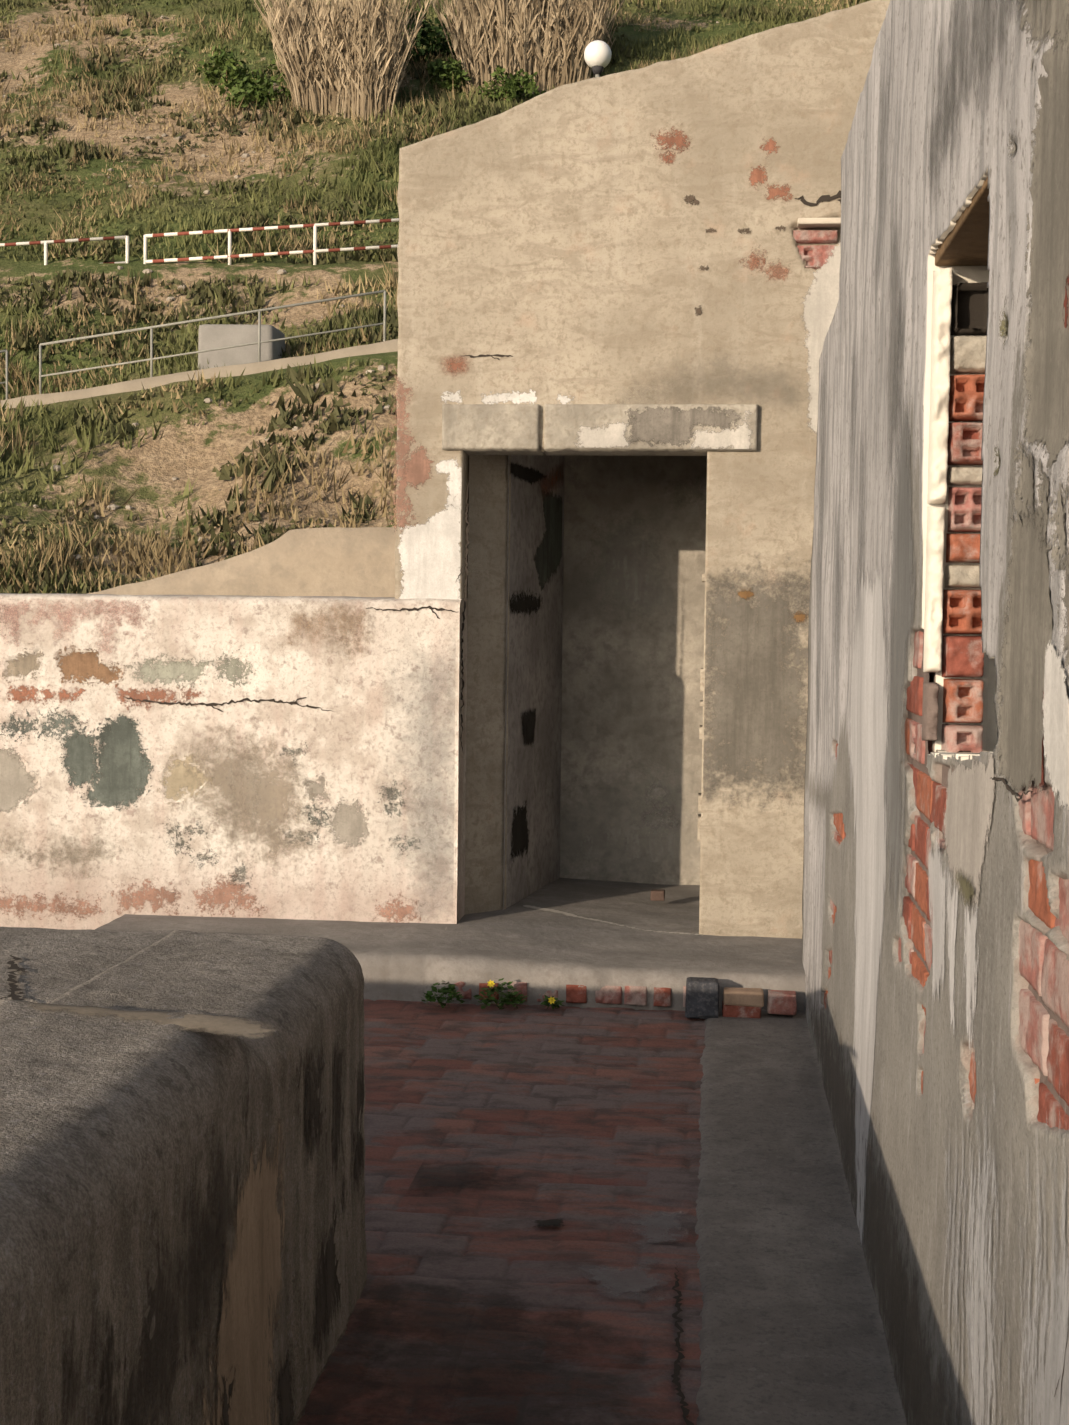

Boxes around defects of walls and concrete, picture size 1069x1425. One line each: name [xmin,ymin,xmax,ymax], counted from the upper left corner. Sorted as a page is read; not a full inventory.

flaking render [653,126,690,163]
crack [795,190,841,206]
water stain [930,0,1022,171]
flaking render [0,645,256,867]
crack [117,694,331,712]
crack [366,474,470,751]
peeling [389,378,462,600]
flaking render [898,631,954,988]
flaking render [993,0,1069,1130]
water stain [100,1159,250,1425]
water stain [300,1041,364,1361]
crack [671,1266,694,1425]